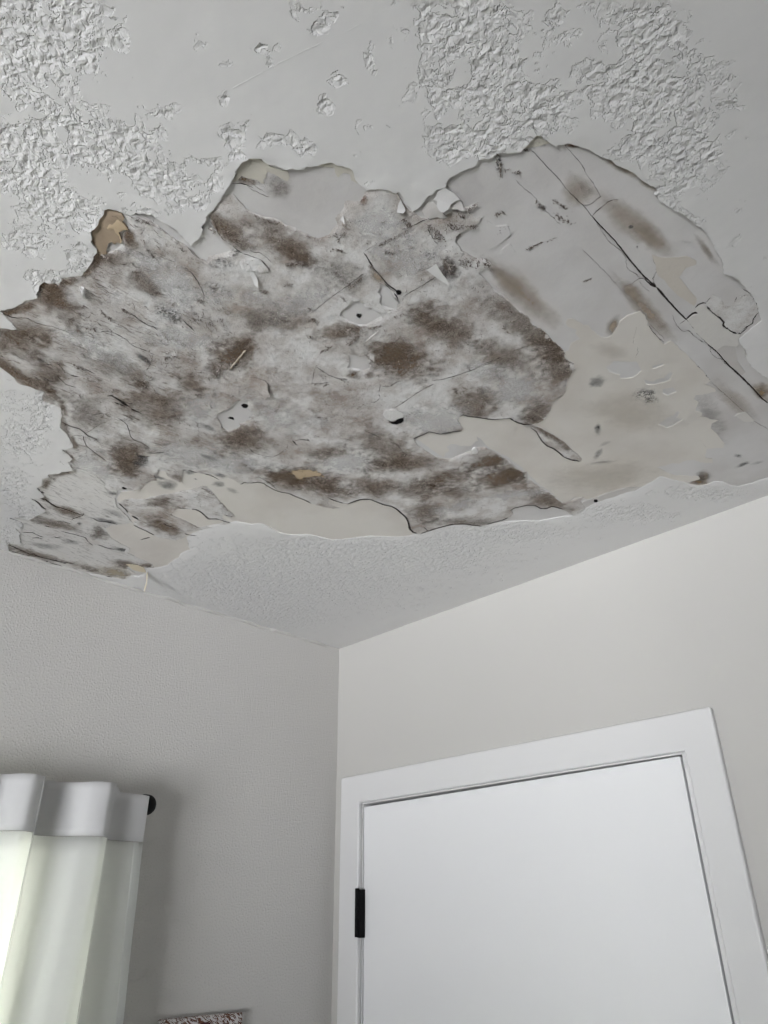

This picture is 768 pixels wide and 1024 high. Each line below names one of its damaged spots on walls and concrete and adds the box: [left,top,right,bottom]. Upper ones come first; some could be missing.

leakage [40,231,158,325]
crack [314,218,446,311]
crack [532,126,768,428]
leakage [0,327,65,411]
leakage [211,339,253,376]
peeling [0,136,768,592]
leakage [349,342,433,379]
leakage [487,284,570,382]
crack [62,395,164,461]
crack [10,489,230,566]
crack [188,439,560,534]
leakage [269,435,552,525]